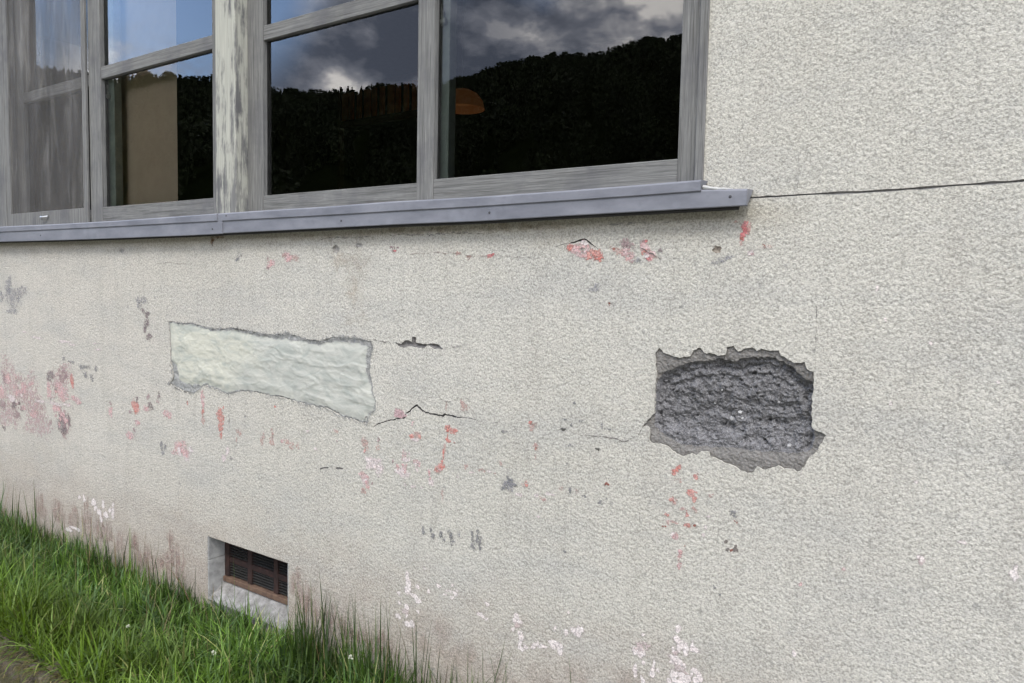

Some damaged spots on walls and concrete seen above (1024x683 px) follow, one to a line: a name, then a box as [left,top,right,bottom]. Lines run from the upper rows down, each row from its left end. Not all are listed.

peeling [556,238,662,263]
peeling [0,355,82,440]
spalling [169,321,443,422]
peeling [358,432,434,493]
crack [364,404,480,427]
spalling [582,346,826,569]